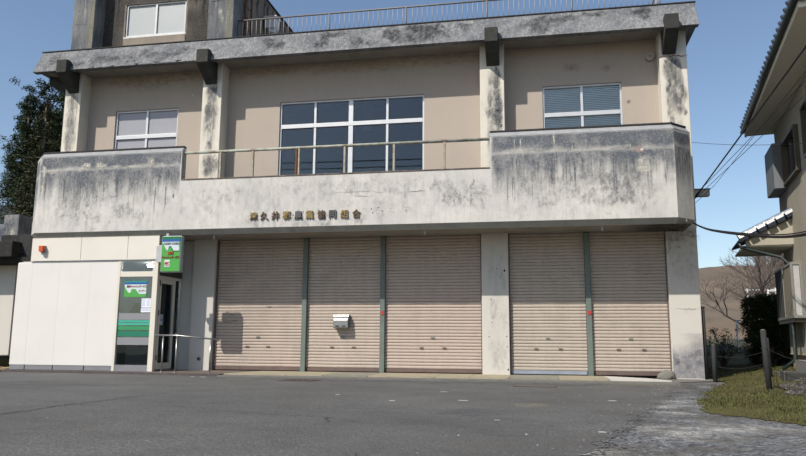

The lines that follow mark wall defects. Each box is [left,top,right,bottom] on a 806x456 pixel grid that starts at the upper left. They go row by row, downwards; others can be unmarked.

water stain [385,24,449,42]
water stain [664,57,687,115]
water stain [489,67,689,174]
water stain [35,152,181,196]